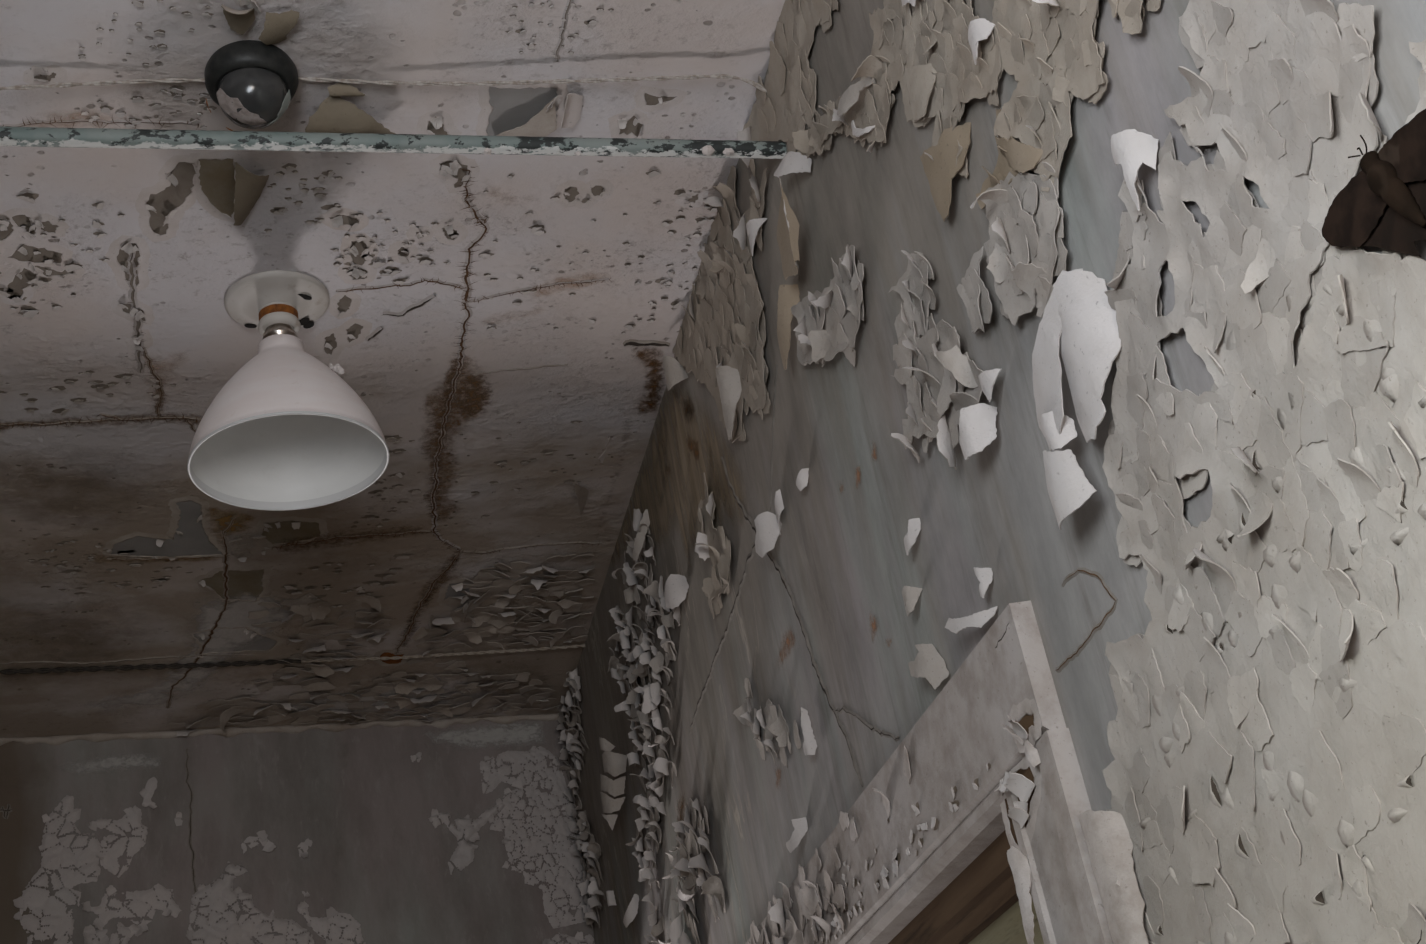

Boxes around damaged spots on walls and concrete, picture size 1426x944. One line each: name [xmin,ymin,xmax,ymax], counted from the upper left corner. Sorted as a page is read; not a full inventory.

crack [554,0,573,61]
crack [0,252,202,432]
peeling [0,151,468,359]
crack [272,166,611,655]
peeling [550,179,614,223]
peeling [621,0,1426,944]
crack [0,517,255,708]